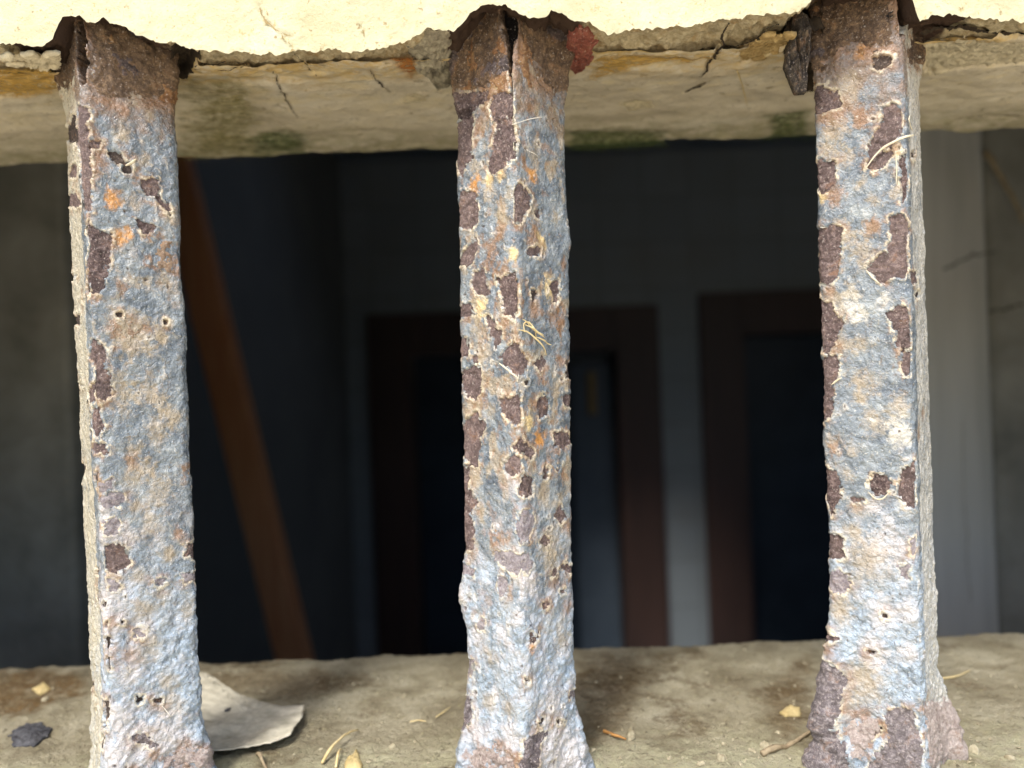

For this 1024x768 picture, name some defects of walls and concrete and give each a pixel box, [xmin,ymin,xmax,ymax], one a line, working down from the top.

spalling [68,115,79,144]
rust [54,19,180,105]
spalling [108,152,137,174]
crack [194,61,298,118]
rust [448,13,575,180]
crack [685,23,779,93]
spalling [872,56,892,70]
peeling [866,115,914,168]
rust [867,103,917,285]
rust [459,184,546,377]
peeling [116,312,140,338]
rust [801,660,968,768]